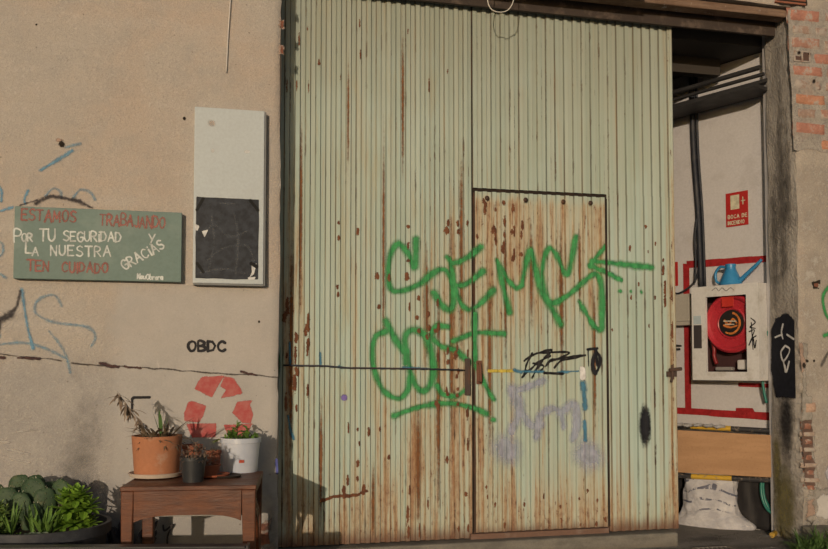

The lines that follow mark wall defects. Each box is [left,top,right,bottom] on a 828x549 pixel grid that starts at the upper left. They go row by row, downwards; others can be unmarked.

corrosion [340,75,349,148]
peeling [774,0,828,153]
crack [0,354,278,378]
corrosion [282,141,310,448]
corrosion [319,419,375,529]
corrosion [375,164,391,329]
corrosion [405,413,429,539]
corrosion [408,183,469,486]
corrosion [482,198,533,338]
corrosion [654,258,673,307]
water stain [766,441,794,538]
spalling [799,343,828,525]